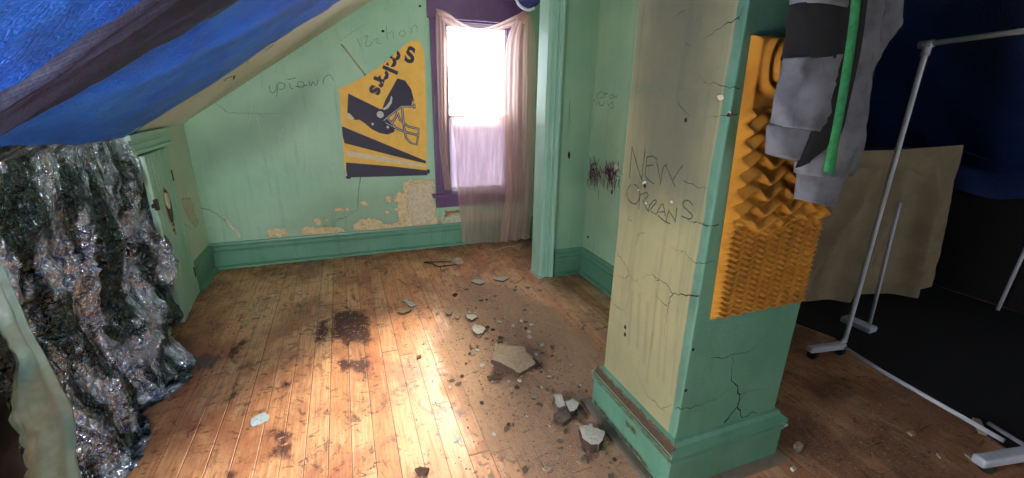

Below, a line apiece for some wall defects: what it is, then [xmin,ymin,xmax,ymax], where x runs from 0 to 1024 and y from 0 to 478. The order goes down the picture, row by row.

peeling [266,178,500,238]
crack [614,233,699,335]
damp [315,311,372,346]
damp [337,358,370,372]
crack [637,331,773,423]